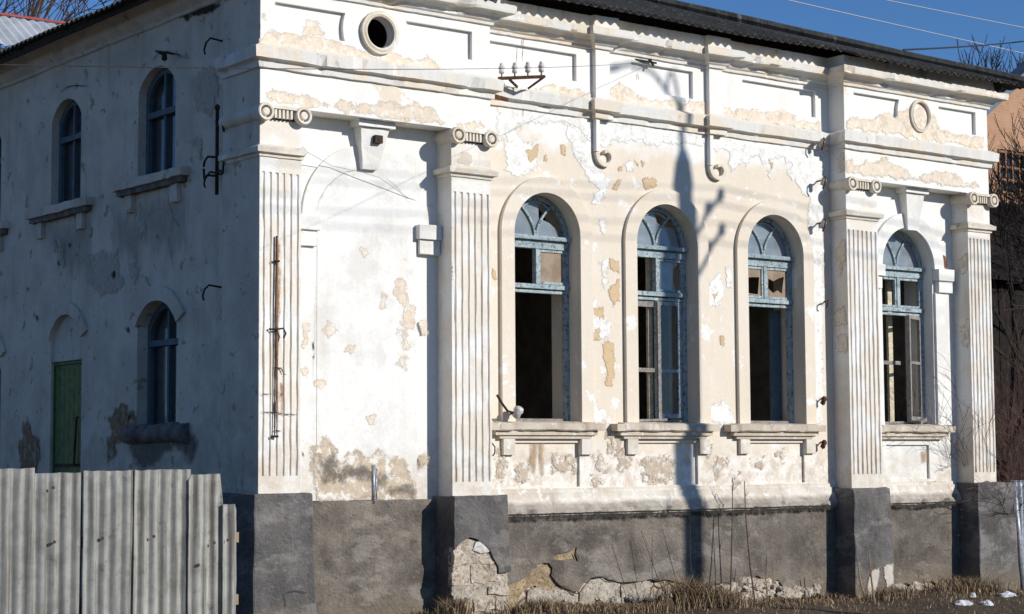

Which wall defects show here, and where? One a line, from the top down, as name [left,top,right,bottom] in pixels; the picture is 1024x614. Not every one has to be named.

flaking render [259,19,464,73]
flaking render [266,88,491,131]
flaking render [847,107,984,149]
flaking render [838,153,980,189]
corrosion [276,245,284,416]
flaking render [380,277,429,370]
peeling [593,258,622,386]
damp [310,438,431,501]
flaking render [494,448,531,484]
flaking render [552,399,677,488]
spalling [448,538,667,614]
crack [551,552,666,594]